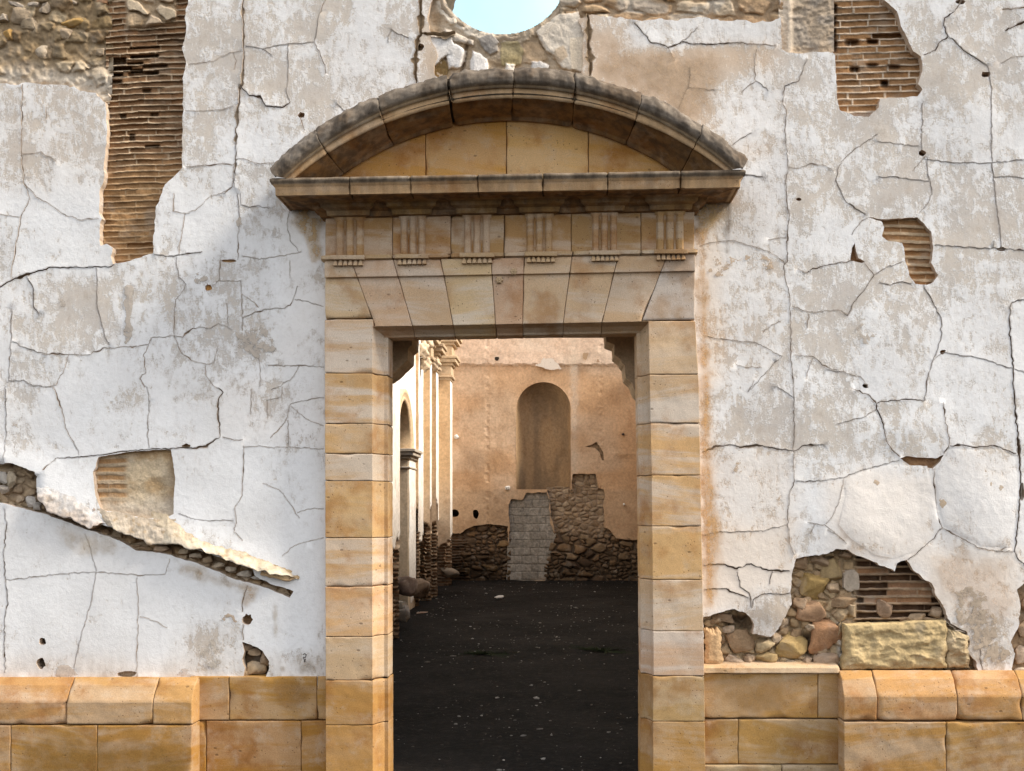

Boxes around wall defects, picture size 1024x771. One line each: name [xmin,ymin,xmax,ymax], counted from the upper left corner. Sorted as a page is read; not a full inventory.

spalling [418,0,920,117]
spalling [0,0,188,263]
crack [0,0,326,541]
crack [634,0,1024,608]
spalling [881,219,935,285]
spalling [92,450,175,518]
spalling [0,464,293,596]
spalling [544,474,638,581]
crack [3,512,170,676]
spalling [244,643,269,676]
spalling [703,549,1024,671]
crack [944,618,991,669]